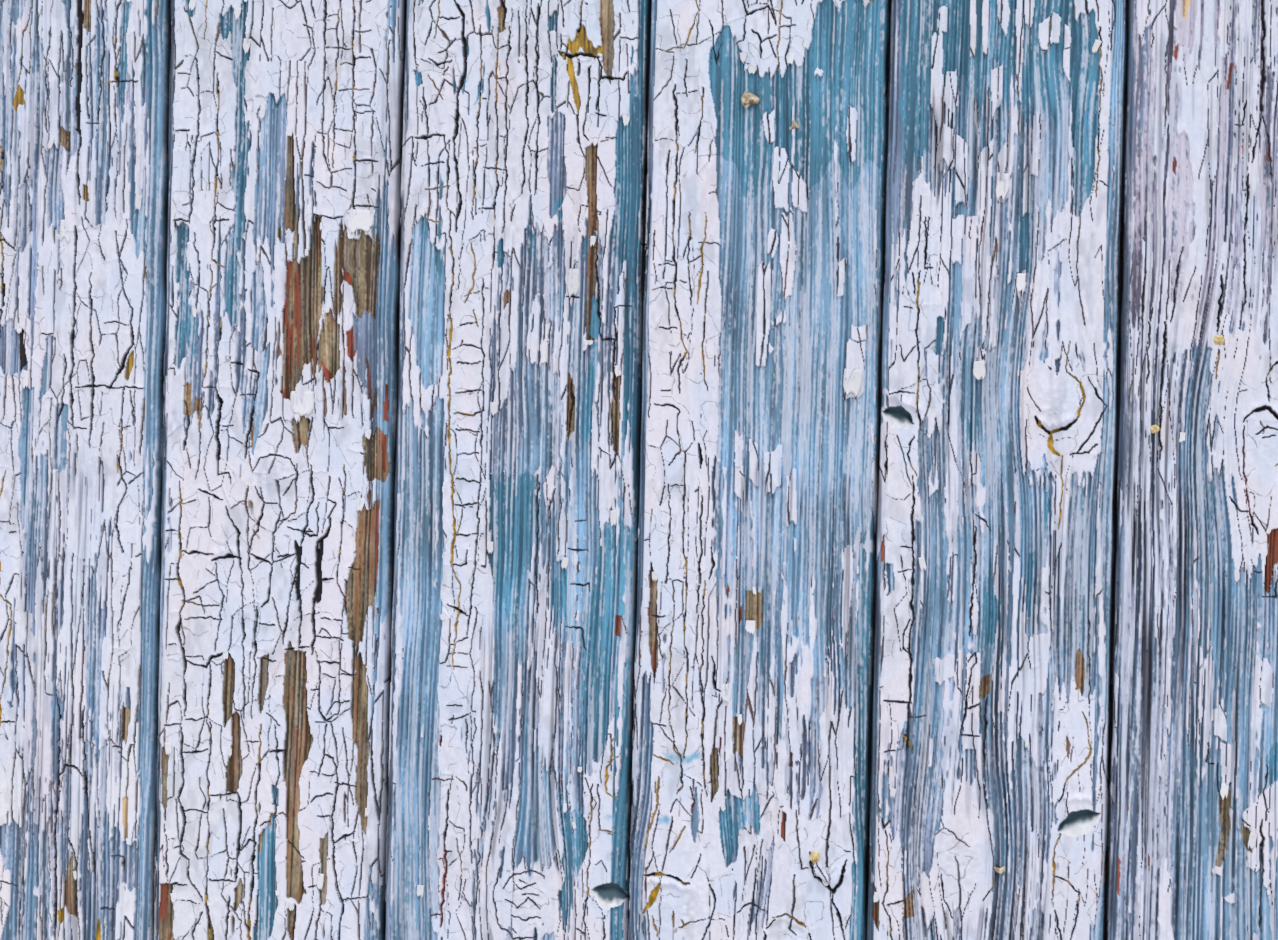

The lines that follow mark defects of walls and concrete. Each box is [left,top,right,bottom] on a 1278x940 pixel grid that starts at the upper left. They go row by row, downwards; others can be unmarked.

crack [0,0,148,940]
peeling [254,642,328,940]
peeling [346,405,447,940]
peeling [488,112,641,640]
peeling [549,496,620,938]
crack [156,0,1041,940]
peeling [719,785,760,867]
peeling [708,0,941,553]
peeling [1065,9,1102,218]
crack [1016,0,1278,645]
crack [1136,593,1276,932]
peeling [1177,339,1278,775]